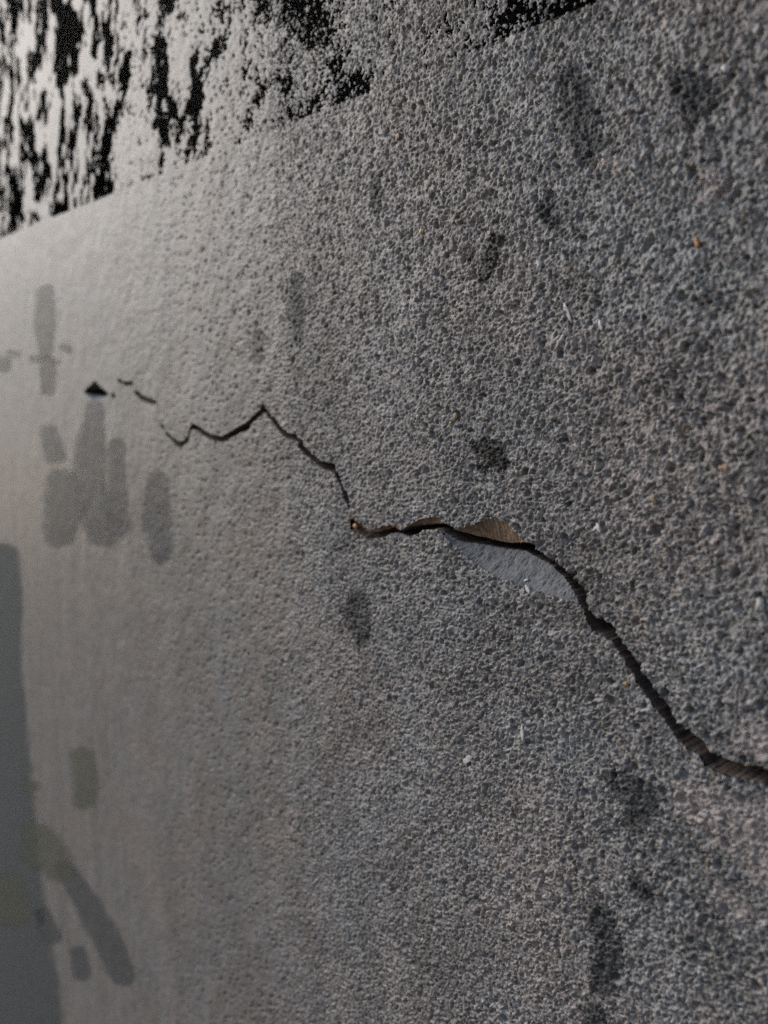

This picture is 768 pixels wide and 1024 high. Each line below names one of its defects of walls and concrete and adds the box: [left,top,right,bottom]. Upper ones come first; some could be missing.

crack [112,378,768,787]
spalling [385,516,578,603]